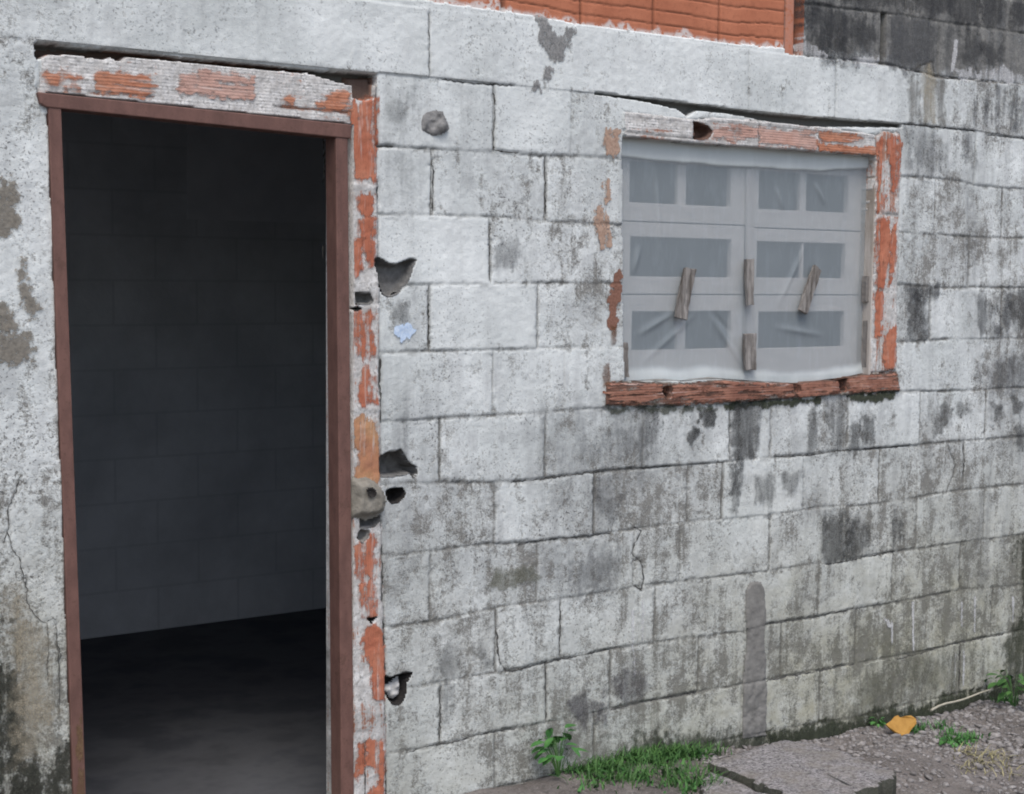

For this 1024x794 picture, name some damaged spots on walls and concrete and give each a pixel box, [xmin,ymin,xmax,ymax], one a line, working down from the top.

flaking render [42,70,158,100]
flaking render [176,68,256,101]
damp [794,0,1024,129]
flaking render [315,89,418,504]
flaking render [603,121,903,407]
damp [908,283,940,338]
damp [995,397,1024,451]
crack [518,526,644,591]
damp [822,514,870,565]
crack [3,474,61,715]
flaking render [354,514,412,706]
flaking render [354,737,386,794]